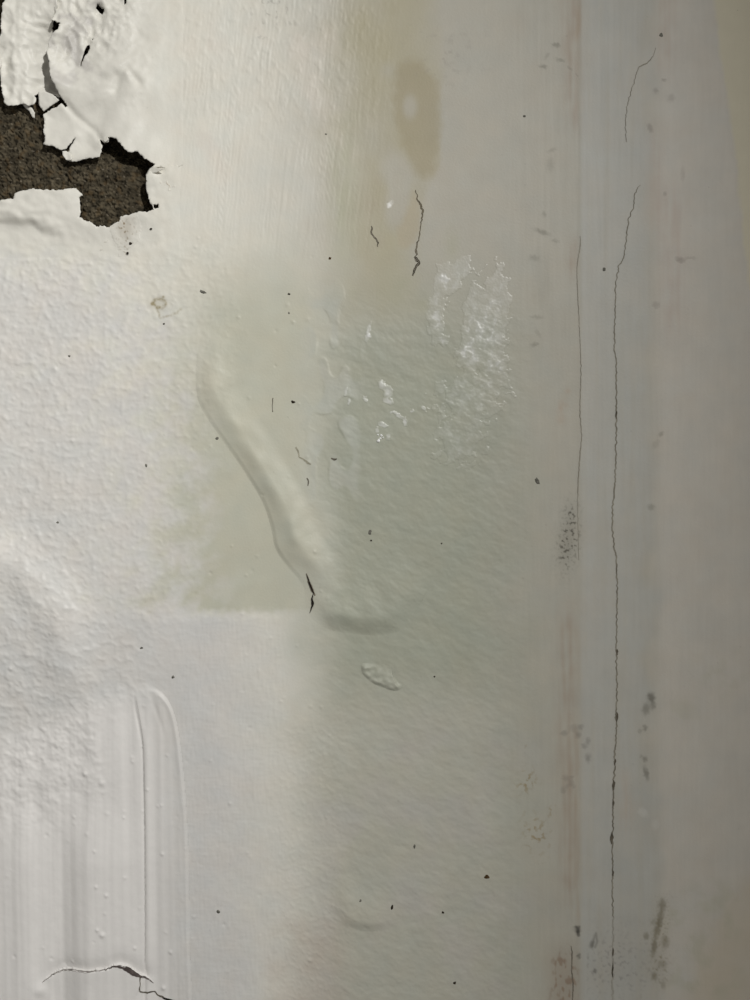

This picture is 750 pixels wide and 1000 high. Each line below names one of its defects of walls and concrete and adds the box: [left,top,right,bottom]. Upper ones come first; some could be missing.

peeling [0,0,184,258]
crack [625,48,656,142]
leakage [240,0,517,470]
crack [412,190,424,276]
leakage [550,489,587,585]
crack [610,186,639,996]
crack [42,965,172,1000]